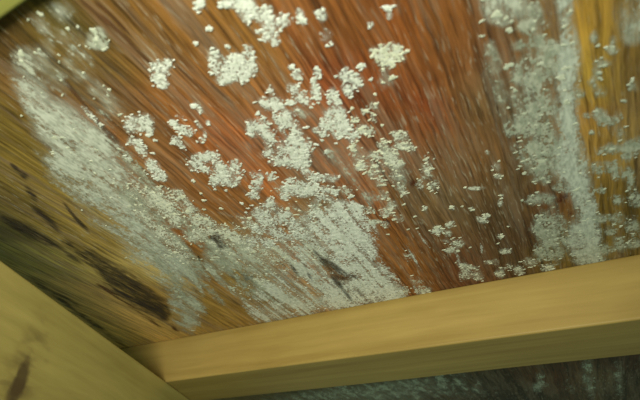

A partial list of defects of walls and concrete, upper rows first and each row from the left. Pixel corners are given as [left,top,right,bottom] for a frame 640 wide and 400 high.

water stain [2,217,59,248]
water stain [72,2,175,89]
water stain [13,42,440,331]
water stain [428,0,640,282]